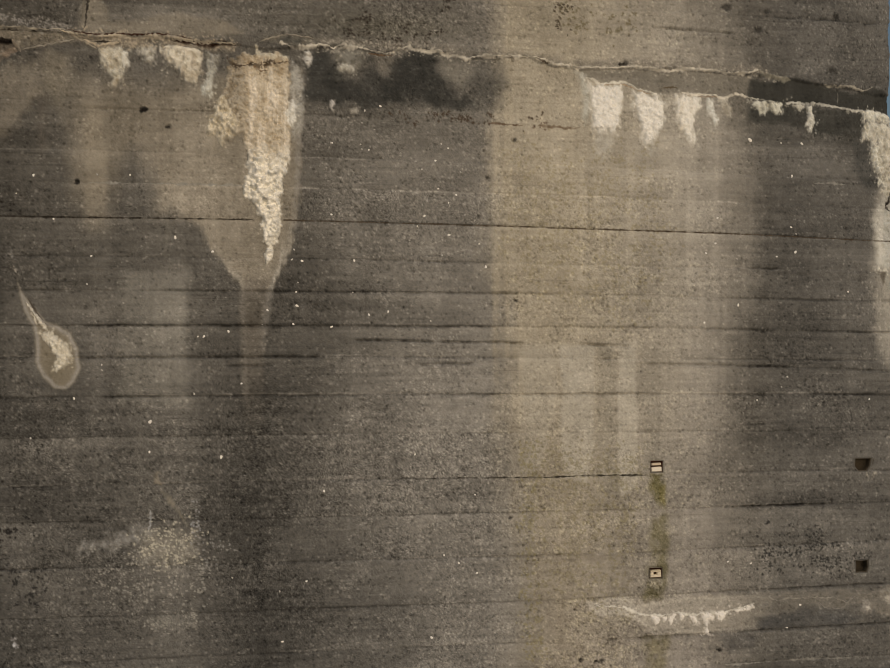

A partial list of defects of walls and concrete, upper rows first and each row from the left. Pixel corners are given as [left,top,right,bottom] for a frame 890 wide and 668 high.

crack [0,0,872,114]
damp [471,0,763,64]
damp [0,43,513,436]
damp [471,58,890,668]
damp [64,470,243,635]